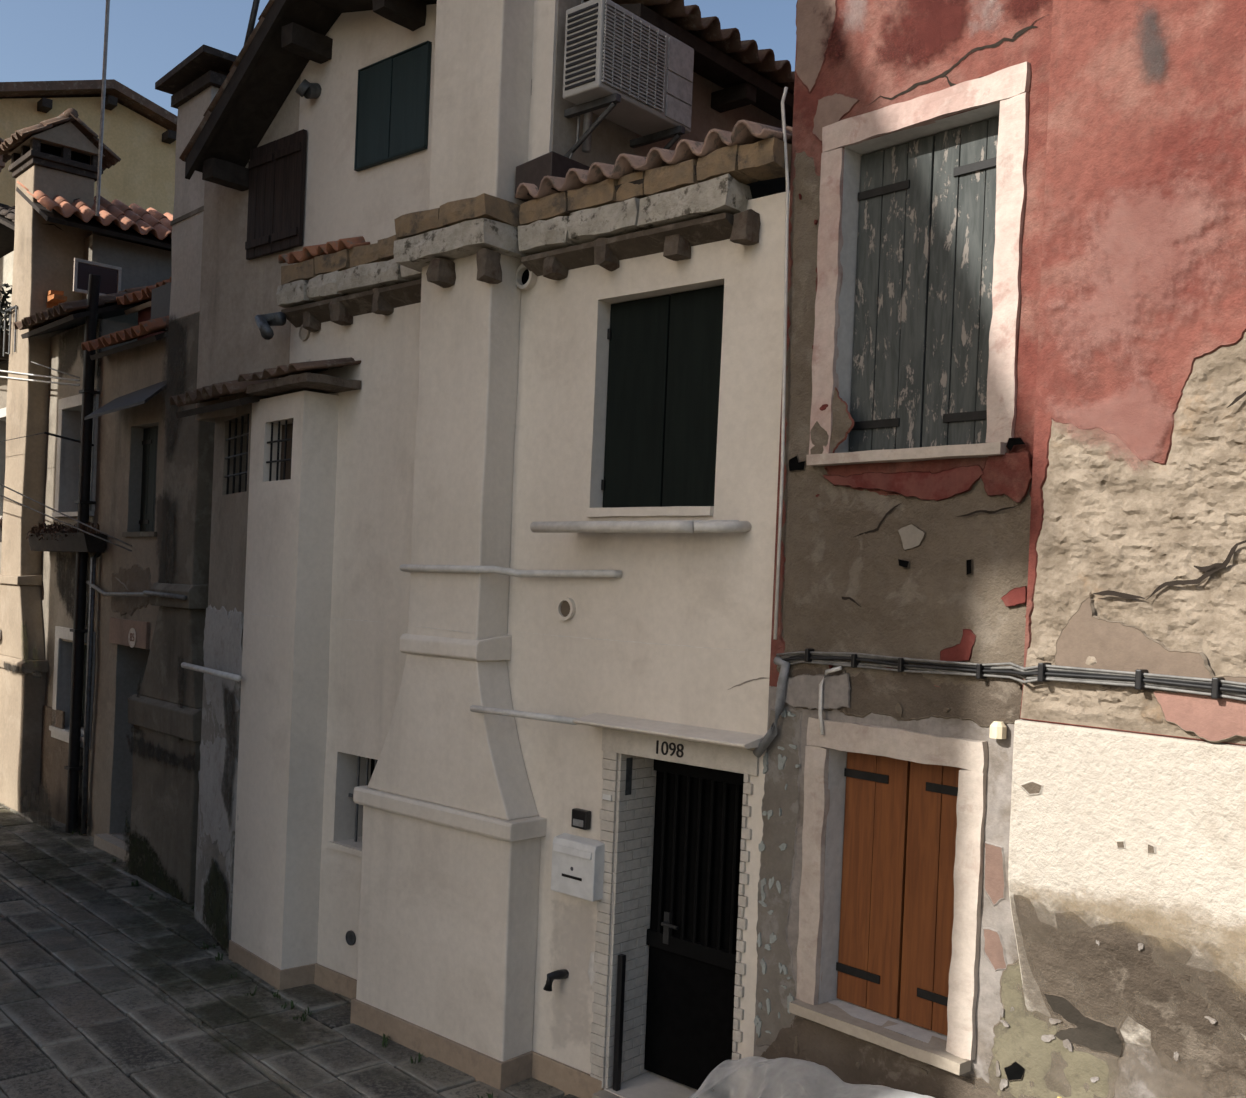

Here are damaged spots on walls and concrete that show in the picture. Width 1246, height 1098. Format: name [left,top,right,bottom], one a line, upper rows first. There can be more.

flaking render [795,0,860,142]
water stain [822,0,862,60]
crack [869,15,1047,105]
water stain [877,0,1047,67]
crack [1093,540,1246,600]
flaking render [754,150,1246,1098]
water stain [221,688,236,827]